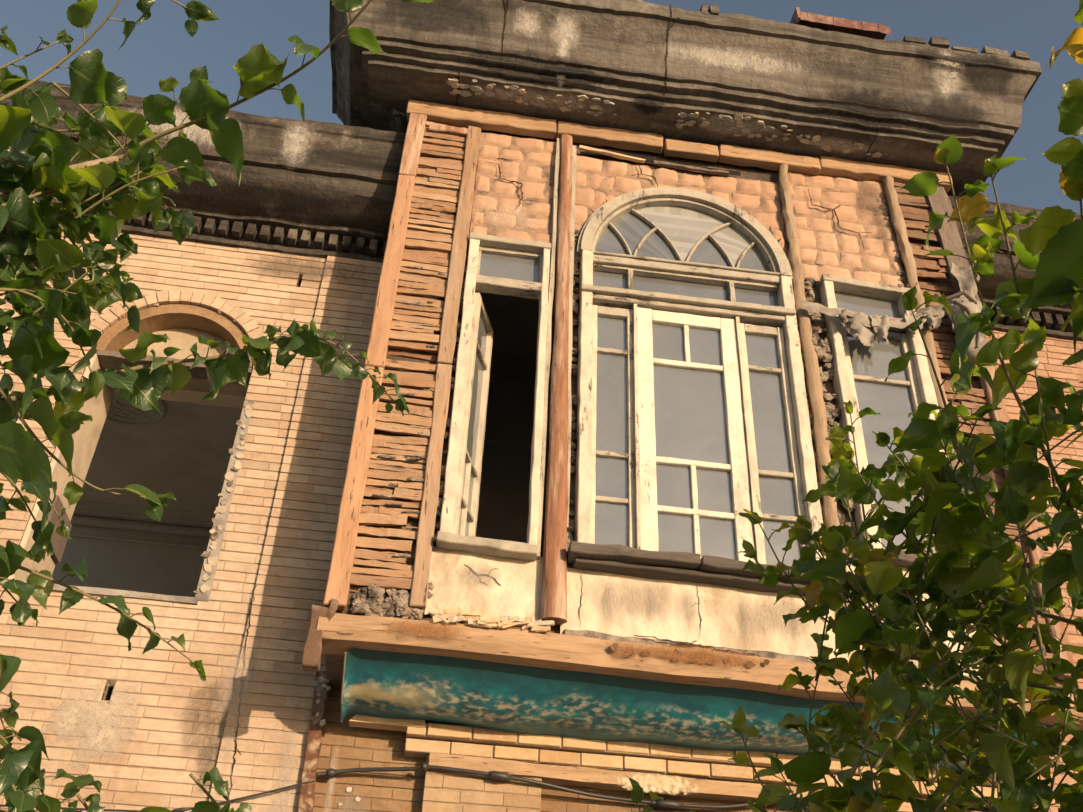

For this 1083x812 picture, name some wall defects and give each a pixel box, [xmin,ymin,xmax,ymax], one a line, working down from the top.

water stain [545,17,596,88]
crack [662,4,679,108]
peeling [446,78,617,116]
peeling [676,112,882,157]
crack [486,161,539,209]
crack [808,189,872,250]
crack [465,565,500,585]
crack [634,589,761,657]
crack [229,585,257,809]